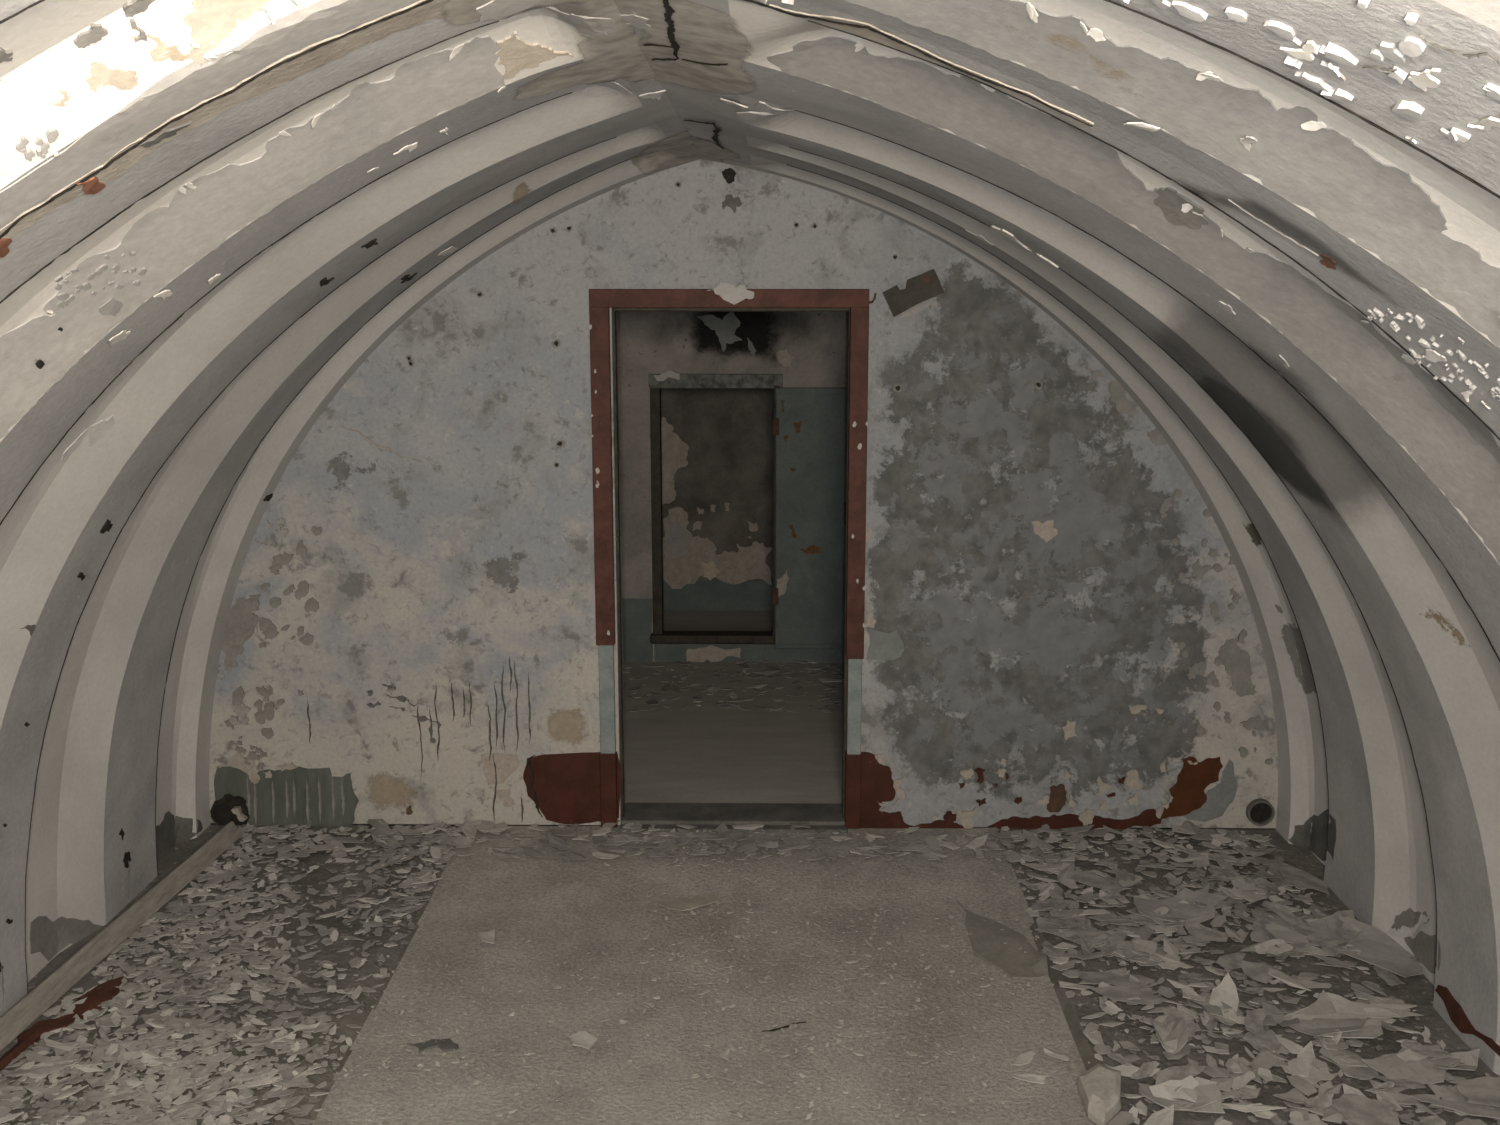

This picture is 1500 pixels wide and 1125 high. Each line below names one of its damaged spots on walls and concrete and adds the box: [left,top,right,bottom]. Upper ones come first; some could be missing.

crack [643,0,728,66]
crack [743,0,1093,127]
crack [0,0,433,239]
crack [684,120,723,149]
peeling [0,0,573,439]
flaking render [722,168,742,213]
peeling [697,282,756,359]
peeling [758,0,1500,564]
peeling [1275,605,1316,694]
flaking render [1178,629,1273,765]
peeling [943,759,1009,829]
peeling [1014,769,1142,826]